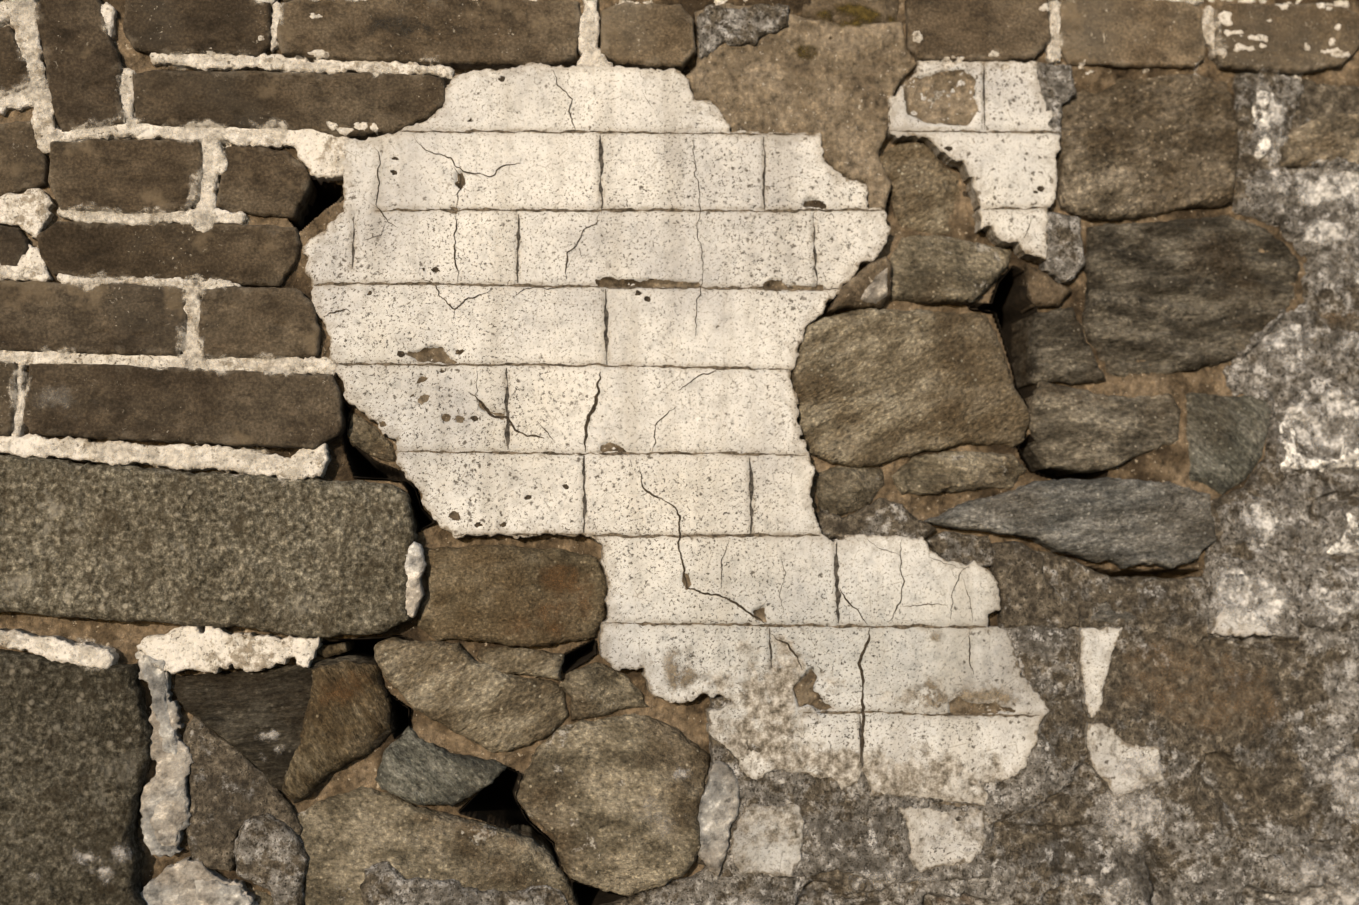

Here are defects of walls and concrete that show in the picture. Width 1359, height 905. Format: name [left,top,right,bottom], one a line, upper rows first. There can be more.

crack [553,70,575,128]
crack [365,147,396,240]
crack [414,136,599,319]
crack [693,137,703,335]
crack [470,369,601,452]
flaking render [289,60,1061,877]
crack [639,369,802,669]
spalling [1016,434,1109,480]
crack [839,538,974,762]